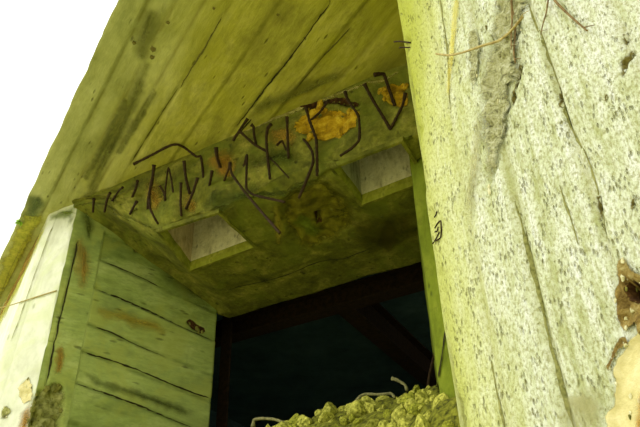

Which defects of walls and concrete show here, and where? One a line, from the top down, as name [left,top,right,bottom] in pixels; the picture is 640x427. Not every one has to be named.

water stain [86,81,153,194]
spalling [133,91,361,246]
spalling [363,72,409,130]
spalling [468,0,526,195]
crack [527,2,599,195]
crack [559,185,578,244]
spalling [18,377,63,427]
crack [515,202,574,427]
peeling [605,257,640,427]